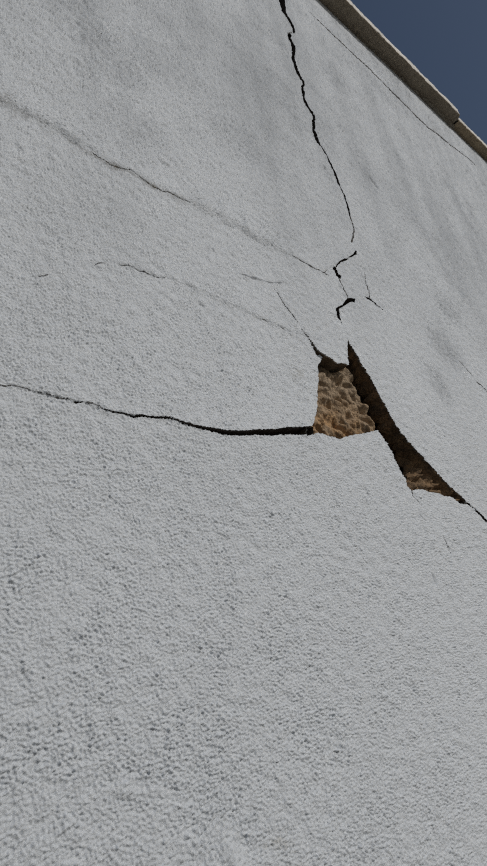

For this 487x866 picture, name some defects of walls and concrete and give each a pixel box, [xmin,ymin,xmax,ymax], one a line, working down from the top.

crack [92,152,190,202]
crack [279,0,383,323]
crack [314,16,475,165]
crack [0,384,313,436]
flaking render [297,337,467,504]
crack [460,501,487,522]